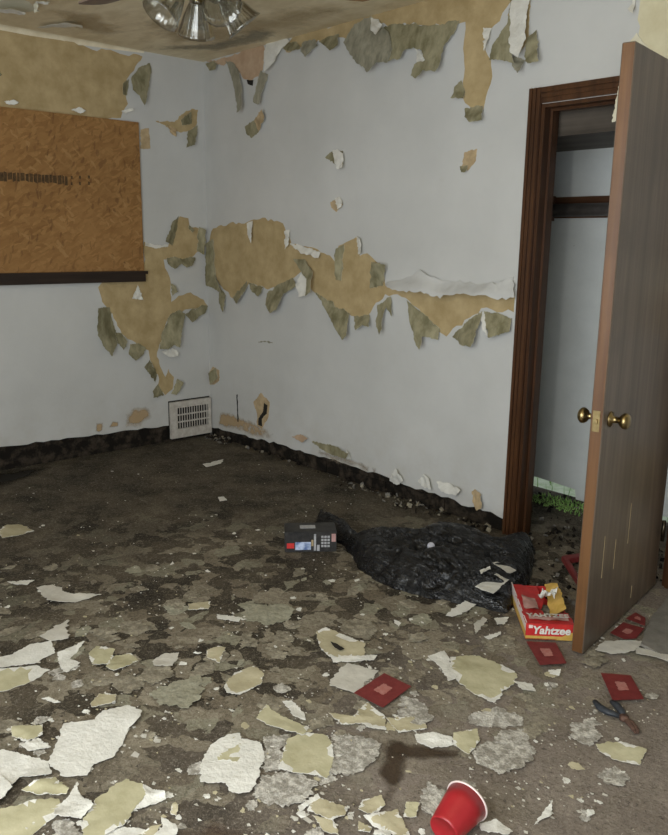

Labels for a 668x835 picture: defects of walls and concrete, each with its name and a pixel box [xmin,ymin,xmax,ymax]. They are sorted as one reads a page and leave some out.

water stain [178,32,266,49]
spalling [253,393,270,429]